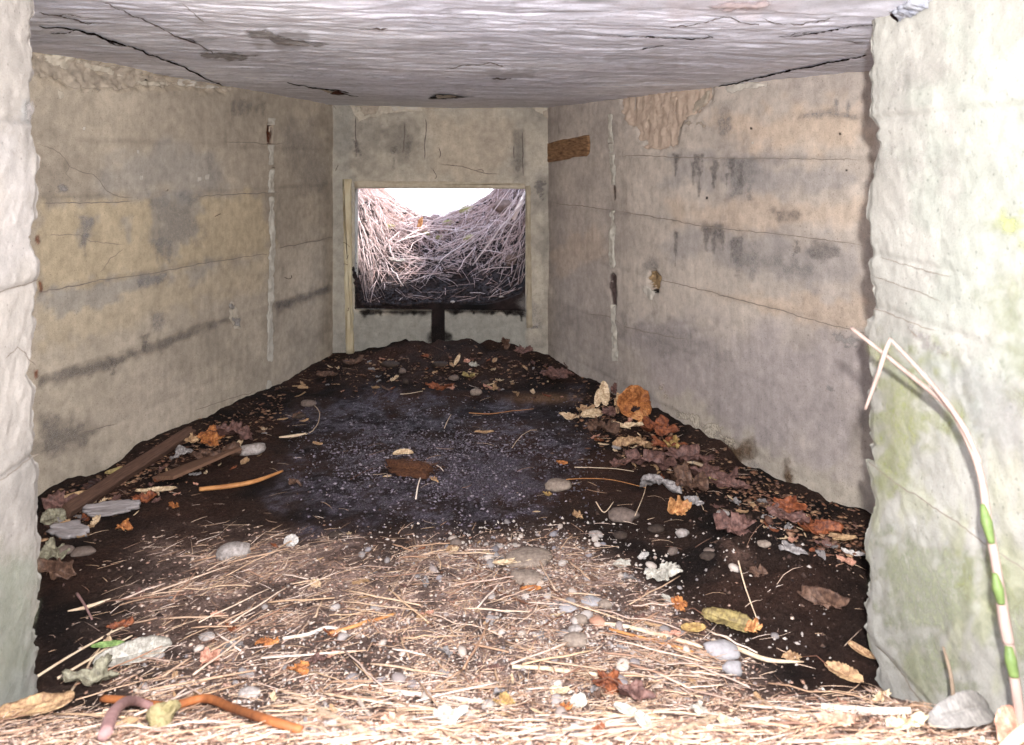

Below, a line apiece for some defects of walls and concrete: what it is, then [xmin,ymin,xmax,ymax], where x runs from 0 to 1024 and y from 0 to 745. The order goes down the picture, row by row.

crack [39,3,222,86]
crack [600,14,898,88]
peeling [621,87,713,150]